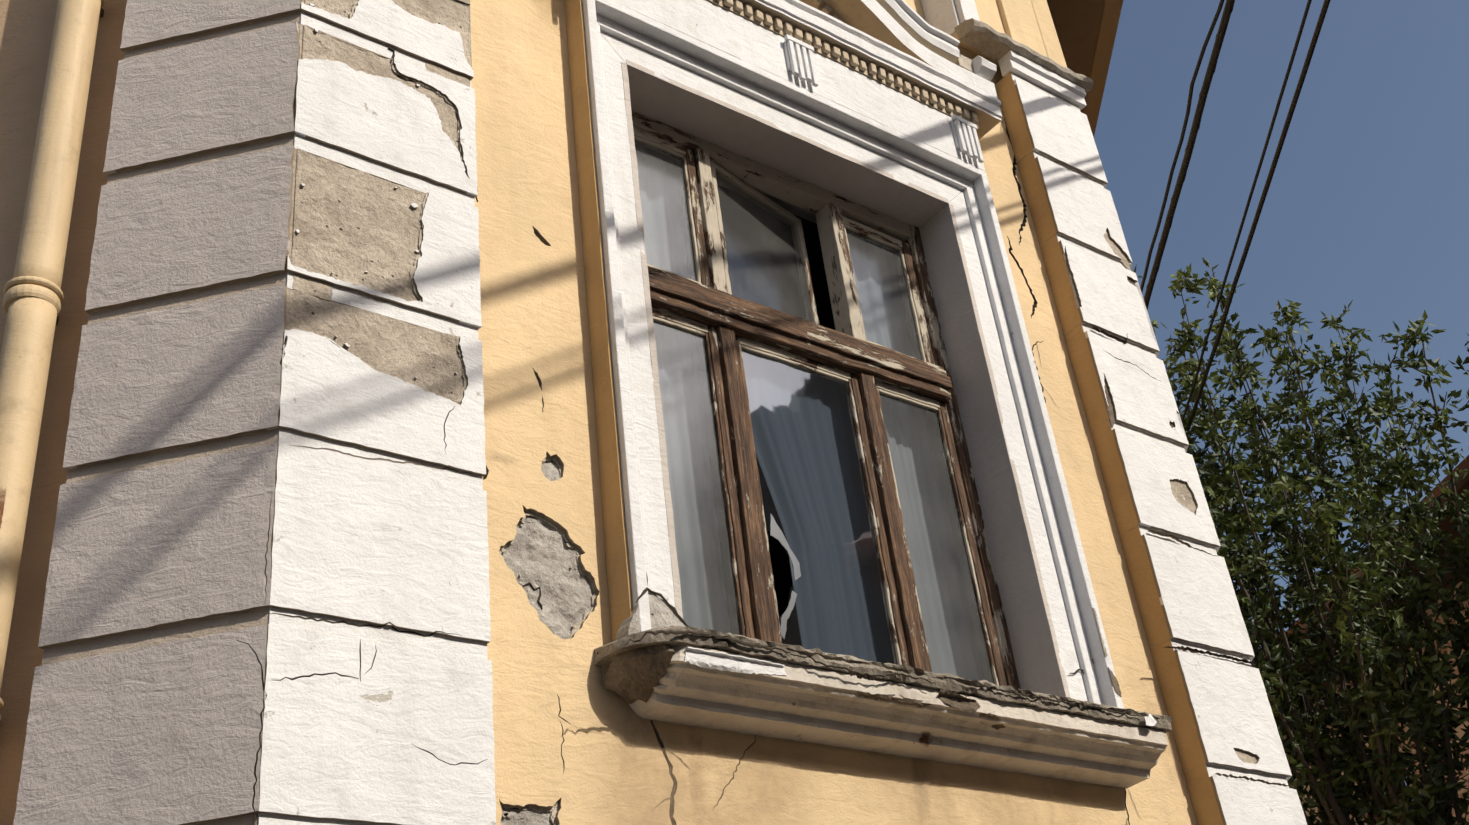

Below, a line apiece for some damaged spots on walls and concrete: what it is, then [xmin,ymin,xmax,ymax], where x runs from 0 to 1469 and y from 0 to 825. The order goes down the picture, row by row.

spalling [302,0,473,173]
spalling [289,148,467,405]
crack [1001,107,1059,409]
spalling [1170,480,1196,513]
crack [237,499,435,825]
spalling [499,511,597,639]
spalling [601,573,688,703]
crack [414,745,487,765]
spalling [500,800,558,825]
crack [650,720,691,825]
crack [713,739,756,808]
spalling [1234,749,1257,764]